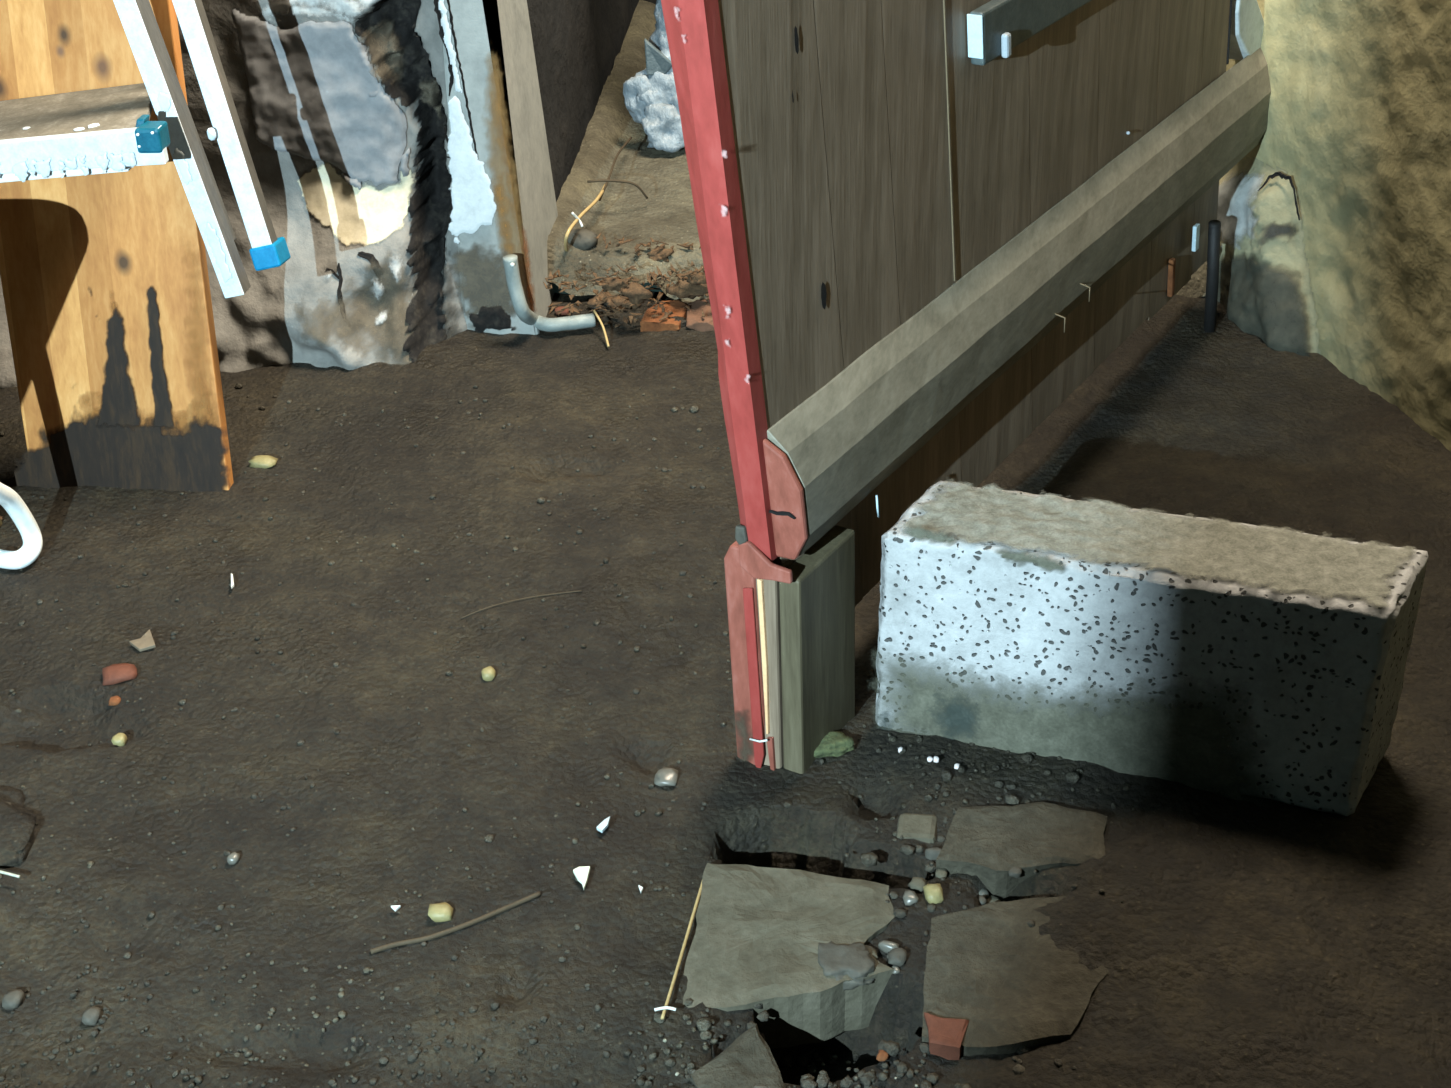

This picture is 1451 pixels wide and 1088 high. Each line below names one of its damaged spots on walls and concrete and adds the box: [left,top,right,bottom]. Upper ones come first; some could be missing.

peeling [232,0,497,363]
spalling [469,306,515,333]